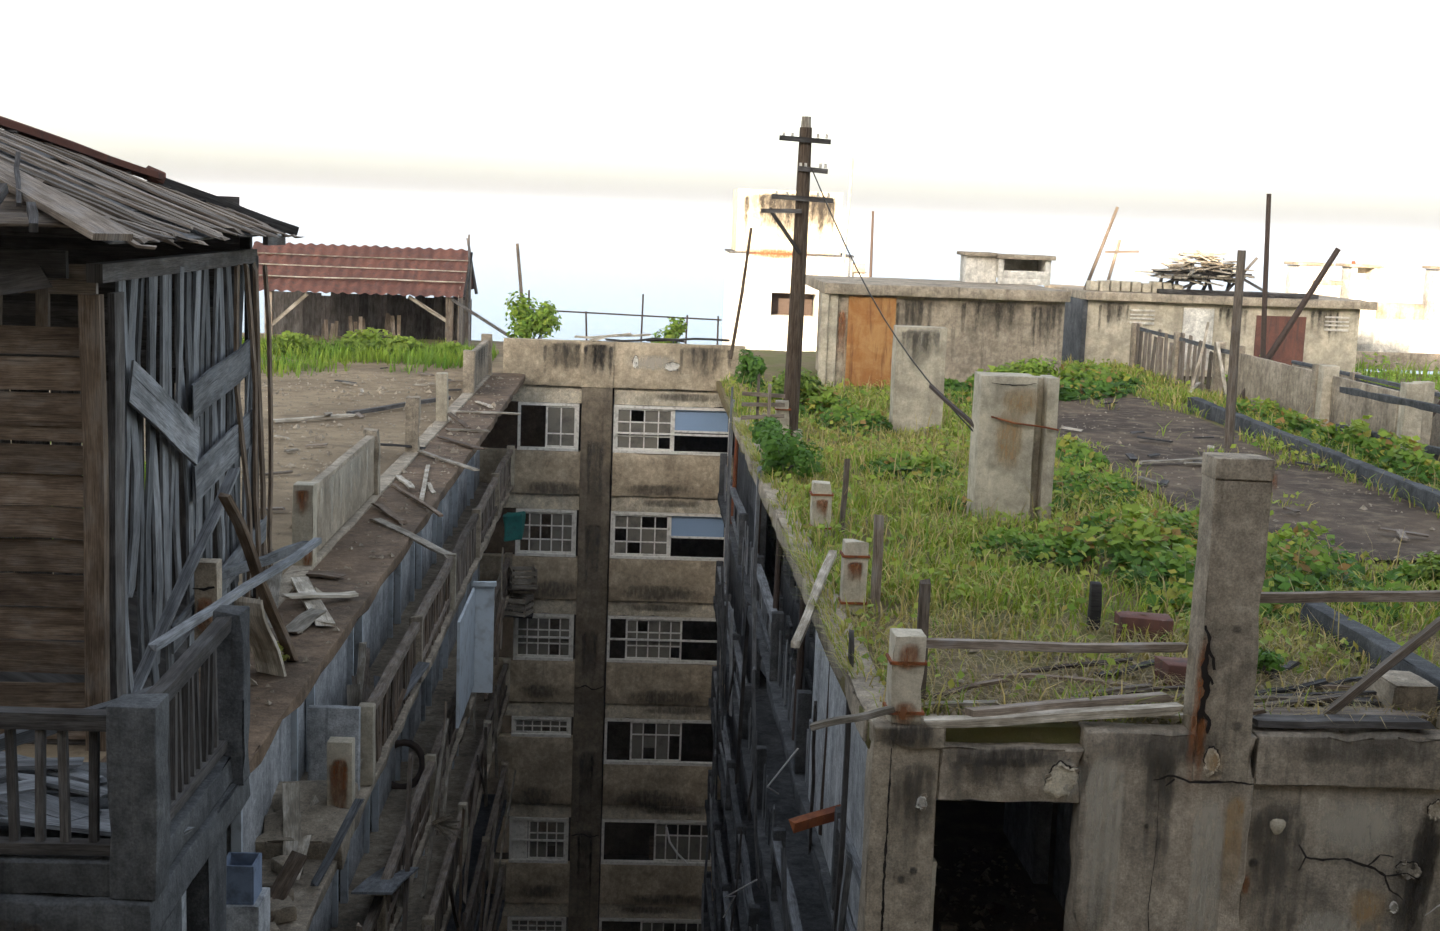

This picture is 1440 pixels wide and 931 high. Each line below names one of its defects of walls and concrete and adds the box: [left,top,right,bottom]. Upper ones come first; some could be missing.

rust [297,490,308,508]
rust [848,562,862,575]
rust [900,646,918,668]
rust [1189,647,1208,767]
rust [330,759,347,807]
spalling [1043,760,1080,799]
crack [1148,625,1254,931]
spalling [1202,746,1222,777]
crack [1298,844,1440,915]